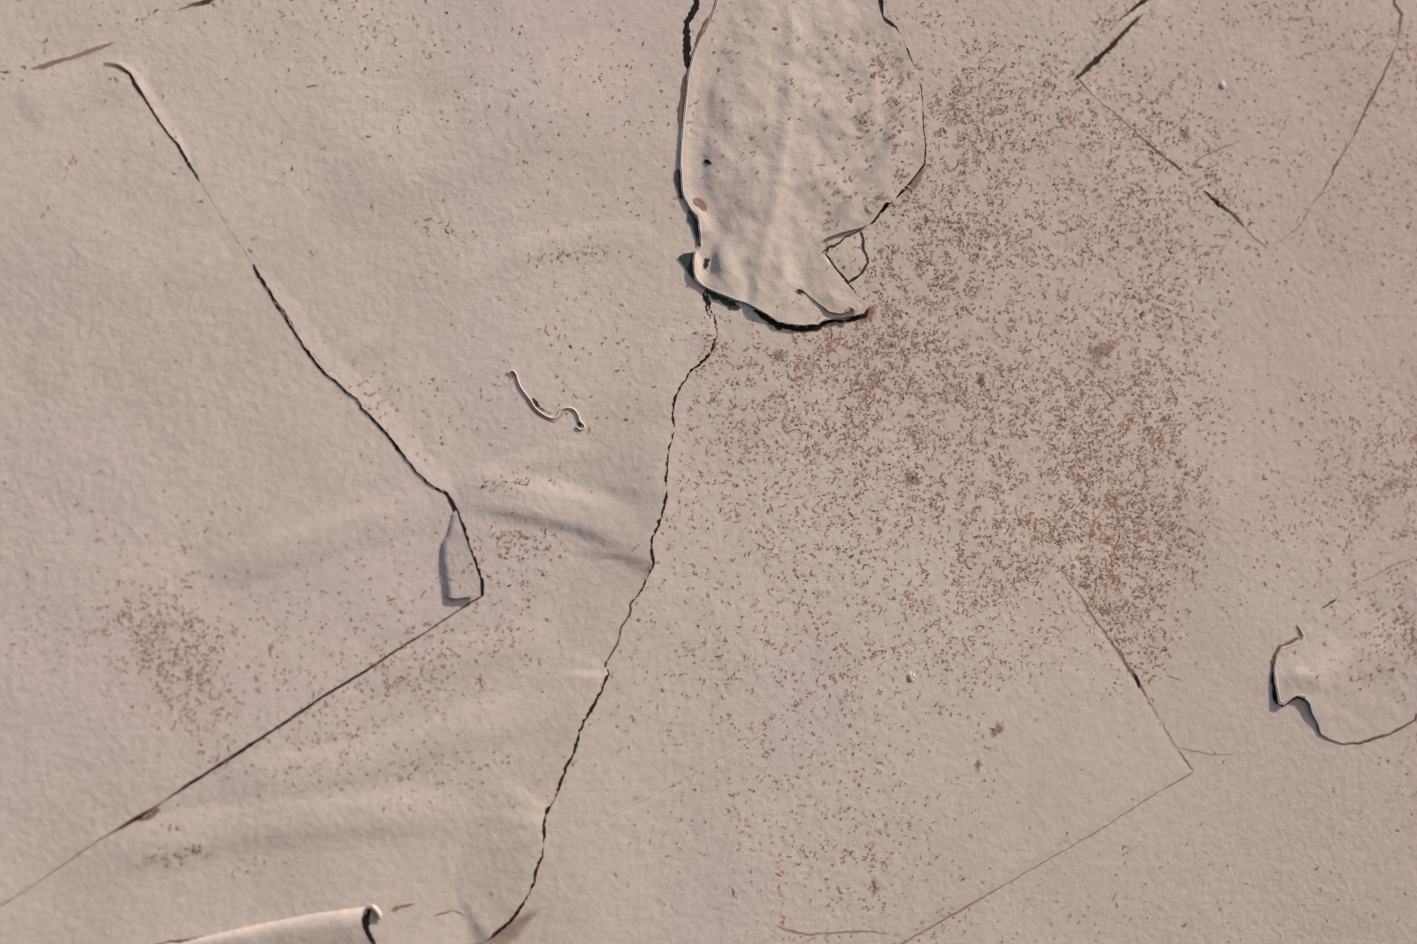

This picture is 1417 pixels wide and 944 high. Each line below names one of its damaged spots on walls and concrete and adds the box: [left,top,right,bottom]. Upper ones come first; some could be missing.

crack [683,0,700,69]
peeling [675,0,927,332]
crack [1079,0,1403,247]
crack [0,0,485,905]
crack [380,288,718,944]
peeling [1271,560,1417,744]